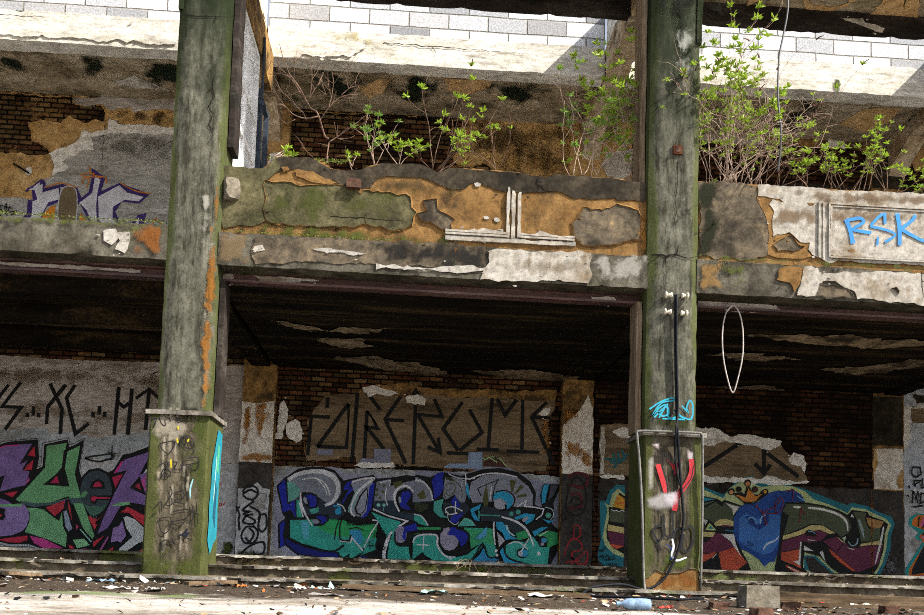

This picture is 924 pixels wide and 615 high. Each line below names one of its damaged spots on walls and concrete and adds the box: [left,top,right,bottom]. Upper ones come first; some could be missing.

leakage [677,31,692,51]
flaking render [0,75,175,178]
flaking render [251,110,646,287]
spalling [698,181,924,306]
efflorescence [156,409,186,476]
corrosion [201,248,216,406]
flaking render [271,320,580,477]
peeling [698,301,779,313]
flaking render [695,385,878,490]
peeling [747,334,924,349]
peeling [821,359,924,375]
flaking render [903,394,924,452]